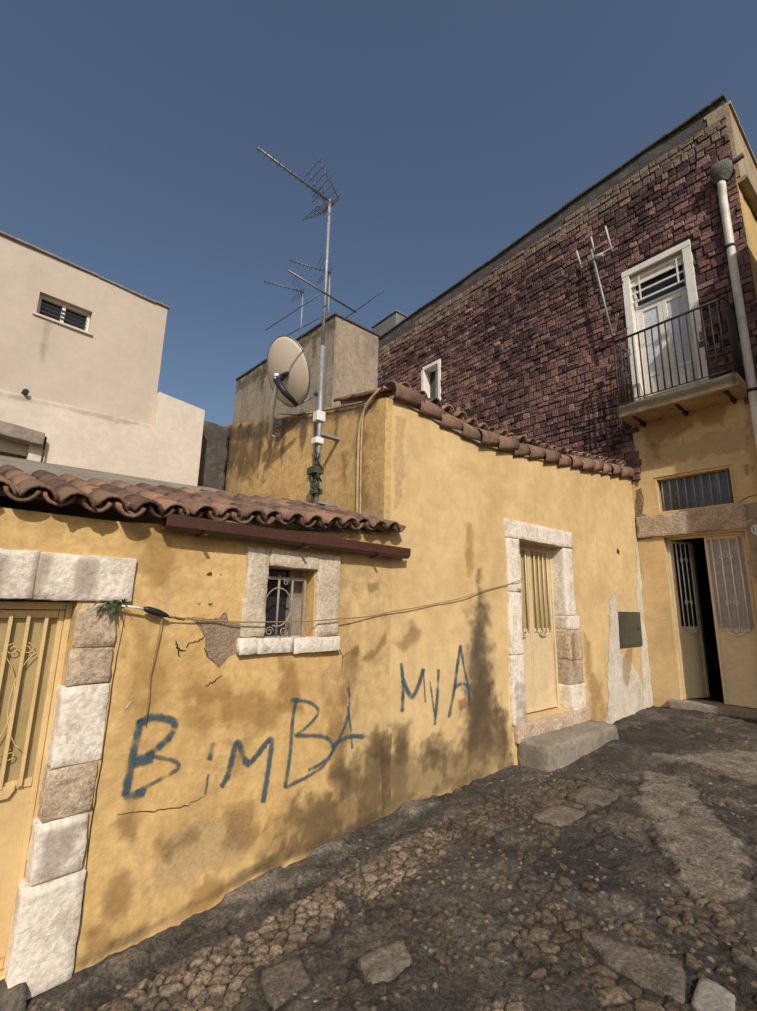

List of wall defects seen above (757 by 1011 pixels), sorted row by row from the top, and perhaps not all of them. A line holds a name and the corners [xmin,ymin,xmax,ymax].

spalling [635,480,647,518]
crack [74,614,197,962]
spalling [186,612,243,667]
damp [232,729,423,884]
damp [420,606,513,794]
peeling [606,531,653,724]